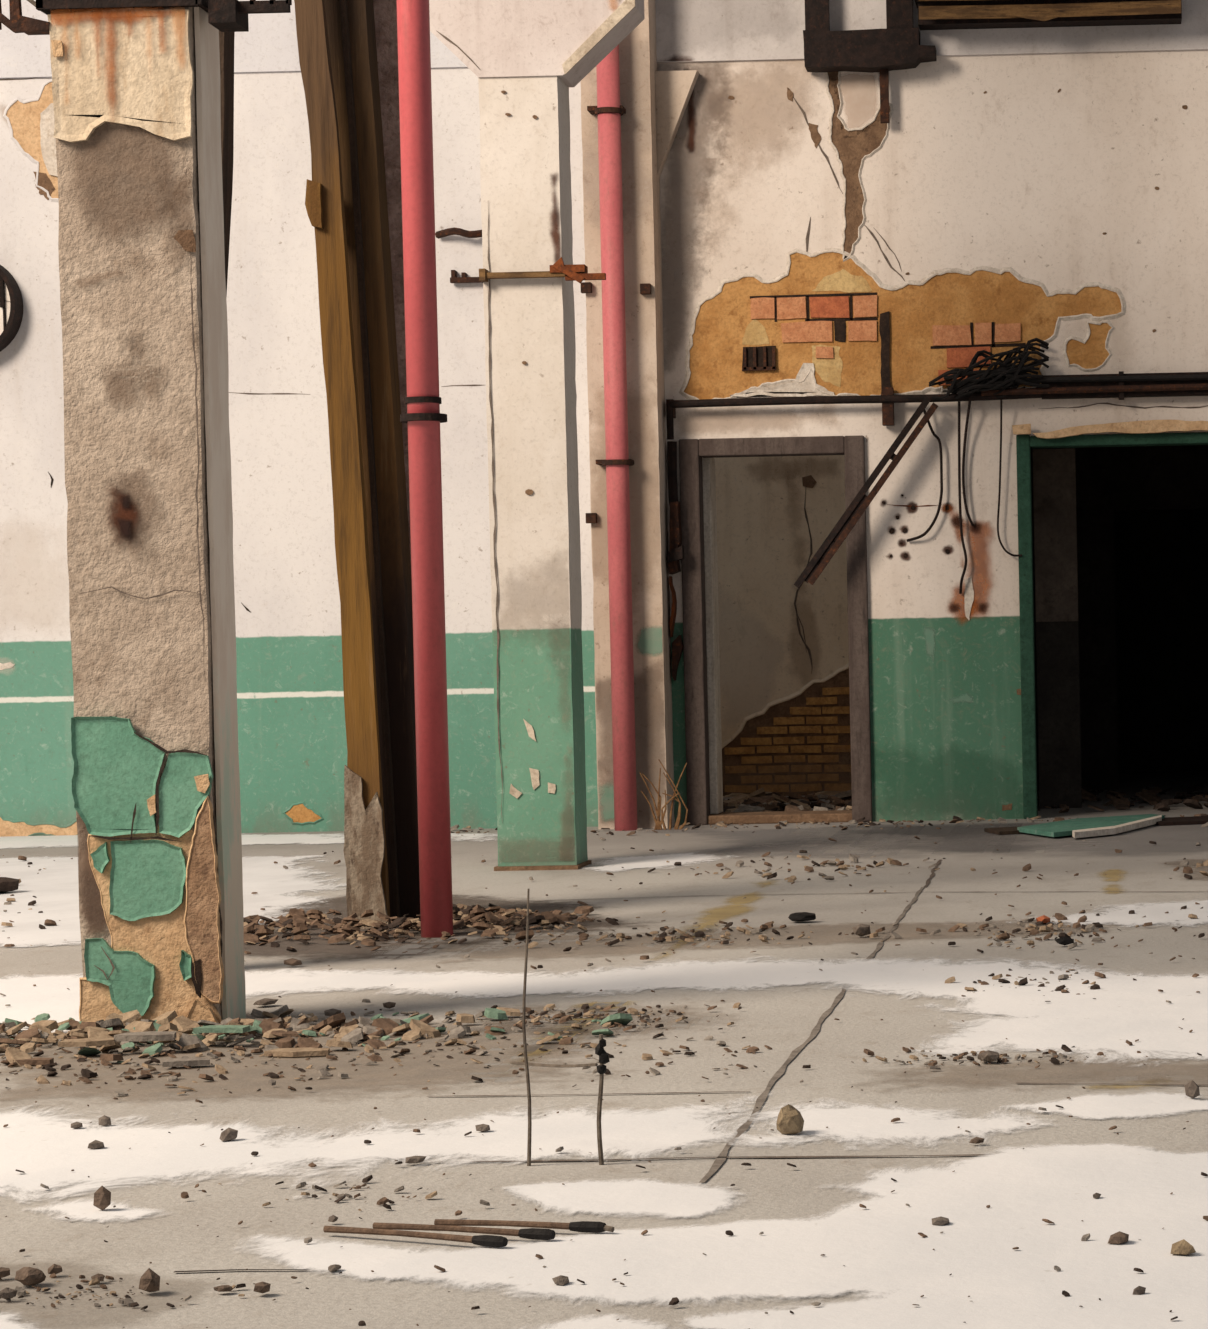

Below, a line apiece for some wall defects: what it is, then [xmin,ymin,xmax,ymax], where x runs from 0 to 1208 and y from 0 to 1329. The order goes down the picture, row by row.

peeling [3,9,194,202]
rust [51,7,163,102]
flaking render [679,71,1126,400]
rust [110,489,137,538]
rust [943,503,990,620]
flaking render [722,663,852,797]
peeling [0,716,224,1031]